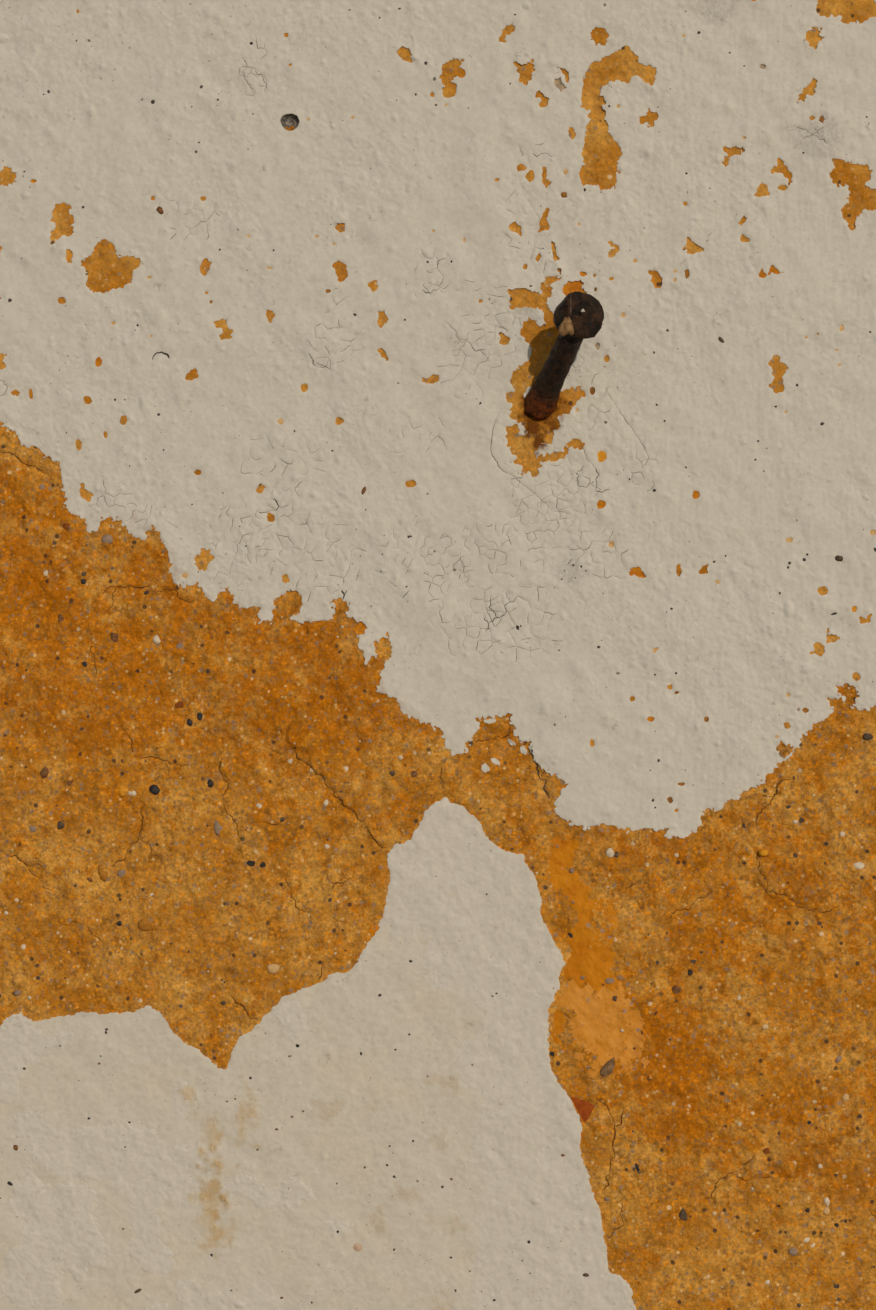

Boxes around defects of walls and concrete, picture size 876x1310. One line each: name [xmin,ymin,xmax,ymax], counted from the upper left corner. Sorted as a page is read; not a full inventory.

peeling [803,0,876,49]
peeling [50,203,151,293]
peeling [513,27,658,198]
peeling [829,158,876,231]
peeling [499,207,614,477]
peeling [0,422,876,1310]